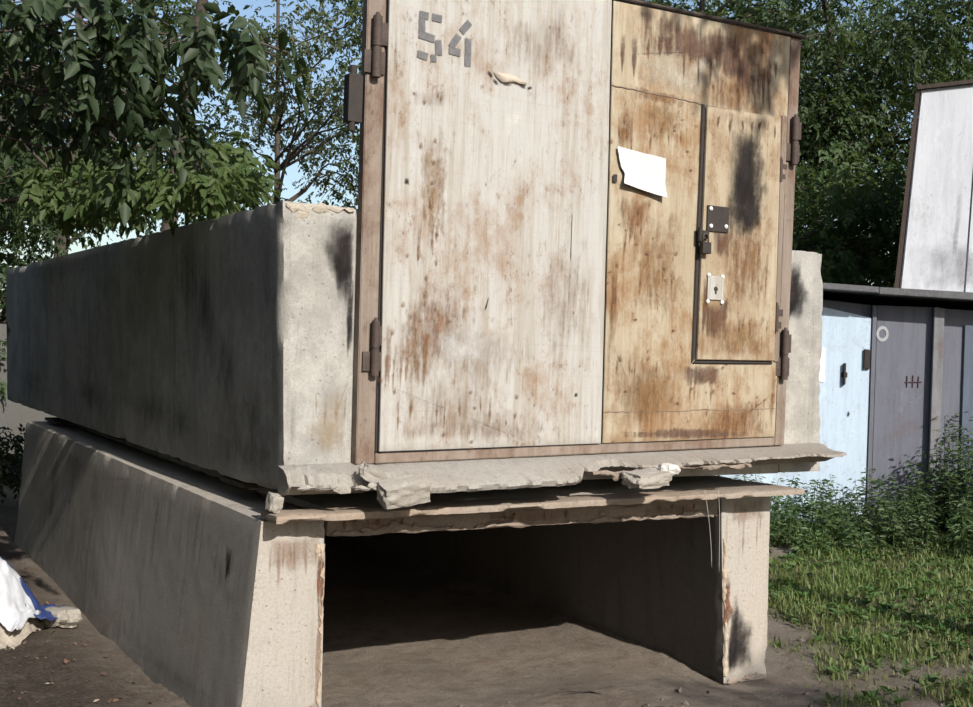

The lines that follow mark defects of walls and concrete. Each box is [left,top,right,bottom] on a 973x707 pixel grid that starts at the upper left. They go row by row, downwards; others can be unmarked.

rust [621,16,777,131]
rust [424,161,444,220]
damp [738,141,759,232]
rust [640,229,676,306]
rust [715,232,767,295]
rust [380,294,460,393]
rust [703,289,759,351]
rust [687,364,727,397]
rust [639,397,761,438]